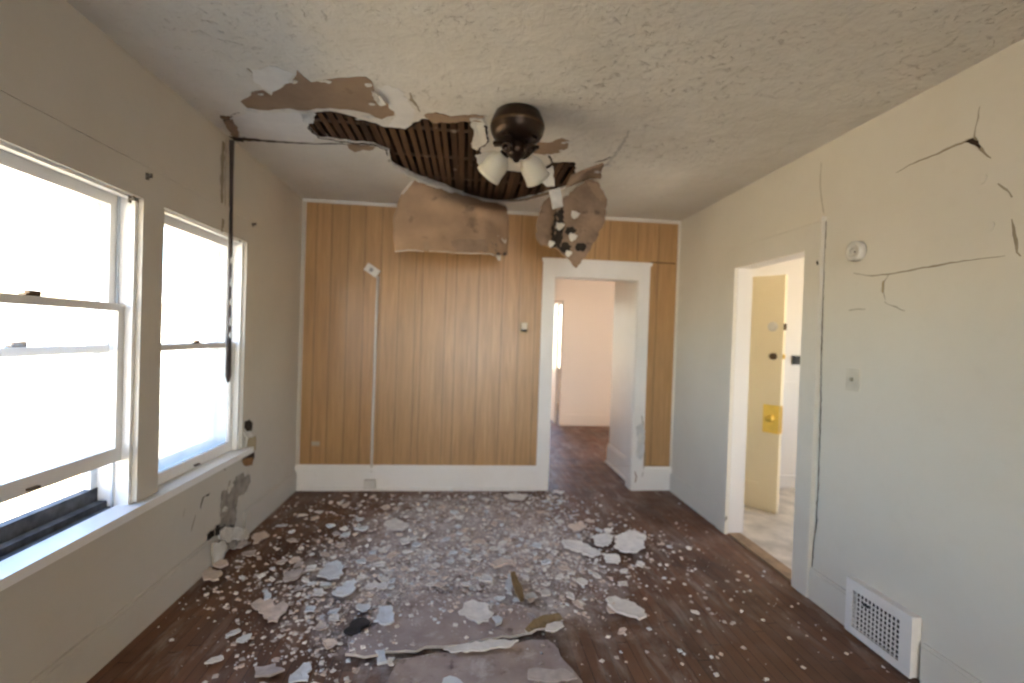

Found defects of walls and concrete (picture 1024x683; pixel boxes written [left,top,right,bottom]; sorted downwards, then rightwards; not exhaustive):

peeling [230,66,421,142]
peeling [533,138,573,156]
crack [896,107,991,173]
crack [848,183,1021,311]
flaking render [200,420,257,565]